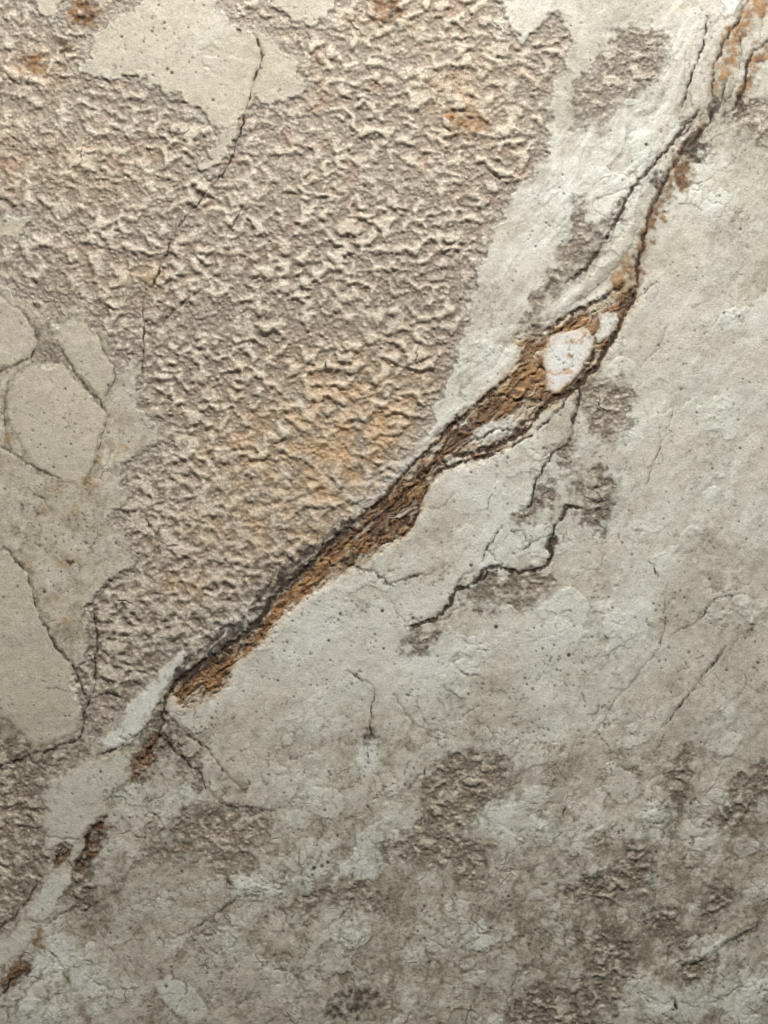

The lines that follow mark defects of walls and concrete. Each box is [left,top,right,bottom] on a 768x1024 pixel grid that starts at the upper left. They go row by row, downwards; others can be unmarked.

crack [0,560,99,767]
spalling [0,0,572,967]
crack [103,17,768,811]
rust [174,124,705,704]